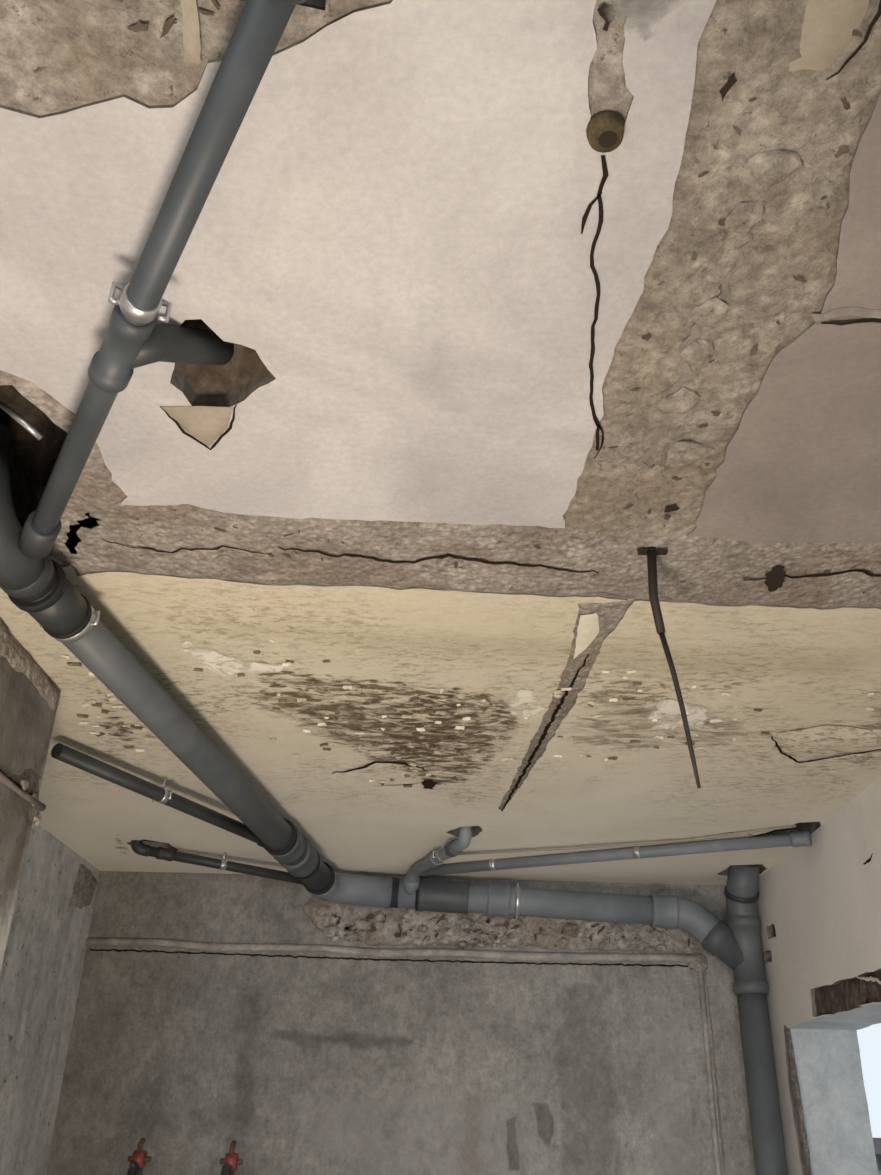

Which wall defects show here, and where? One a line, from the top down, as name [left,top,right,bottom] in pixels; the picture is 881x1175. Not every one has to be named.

spalling [0,0,247,116]
spalling [0,370,75,519]
spalling [48,0,881,812]
spalling [0,618,58,712]
spalling [303,896,704,954]